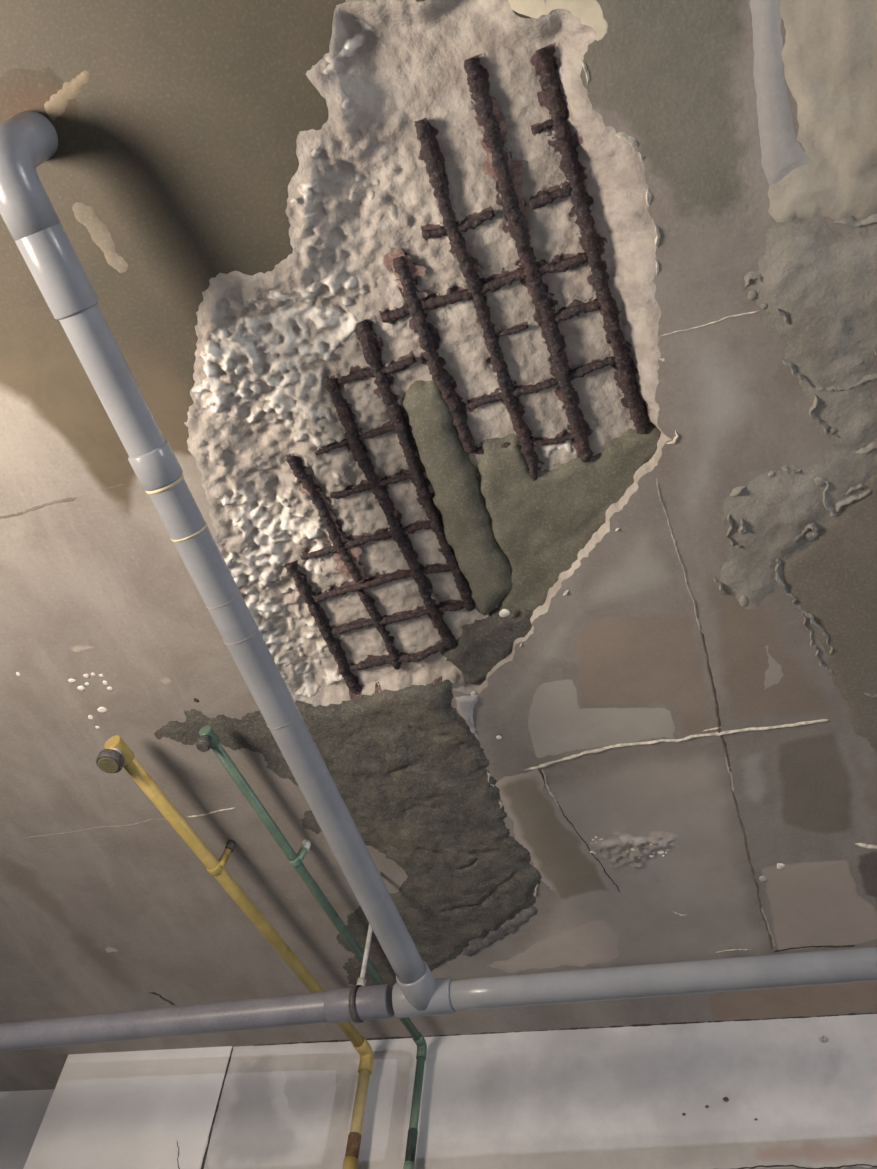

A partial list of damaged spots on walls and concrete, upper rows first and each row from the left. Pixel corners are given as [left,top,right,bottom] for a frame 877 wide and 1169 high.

water stain [0,215,145,533]
water stain [0,0,346,463]
rust [299,485,369,579]
rust [384,248,427,301]
spalling [184,0,672,739]
rust [480,99,533,230]
water stain [580,0,764,254]
water stain [481,305,877,974]
crack [525,478,856,953]
peeling [714,213,877,610]
crack [177,1013,877,1169]